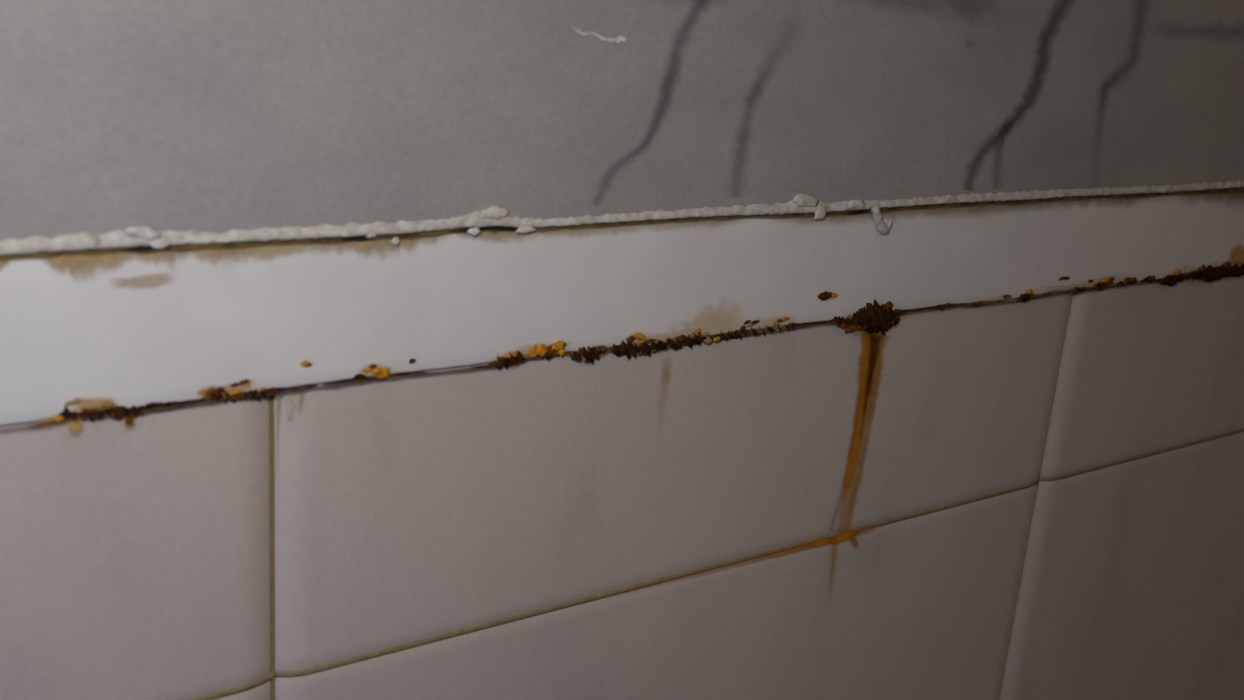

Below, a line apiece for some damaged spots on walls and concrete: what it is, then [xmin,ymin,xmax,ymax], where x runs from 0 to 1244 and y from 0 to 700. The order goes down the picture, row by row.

crack [973,0,1067,170]
corrosion [0,246,1244,570]